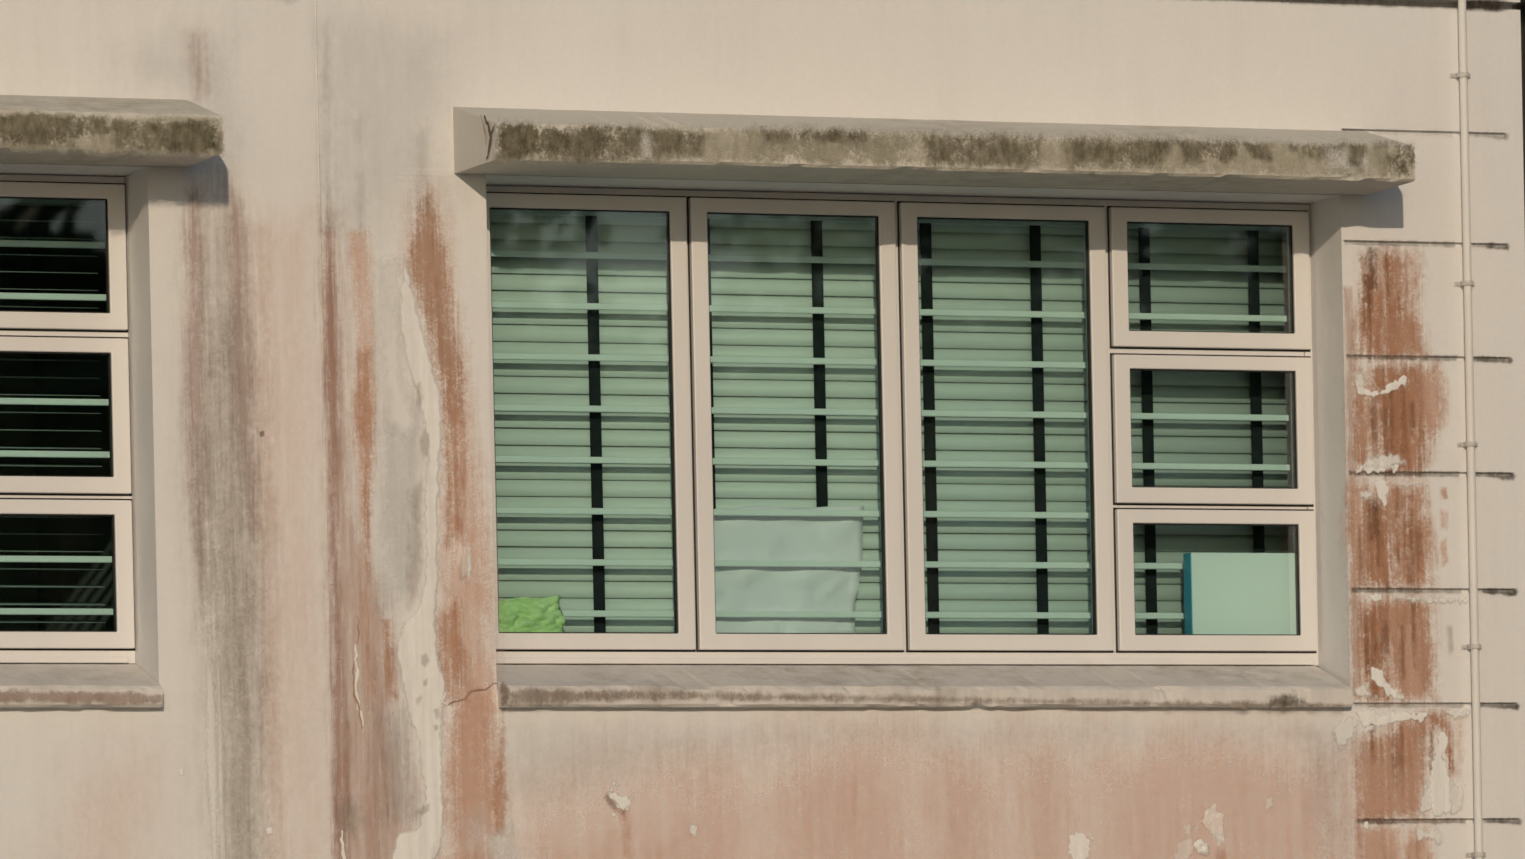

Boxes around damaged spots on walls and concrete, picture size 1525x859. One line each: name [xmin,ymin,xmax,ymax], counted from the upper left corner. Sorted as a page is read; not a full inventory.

rust [352,236,373,523]
peeling [1354,372,1407,397]
peeling [378,262,445,859]
rust [411,202,505,859]
rust [1345,250,1446,700]
crack [442,683,495,706]
spalling [608,782,634,834]
spalling [1068,829,1093,859]
peeling [1332,667,1470,844]
rust [1359,714,1451,815]